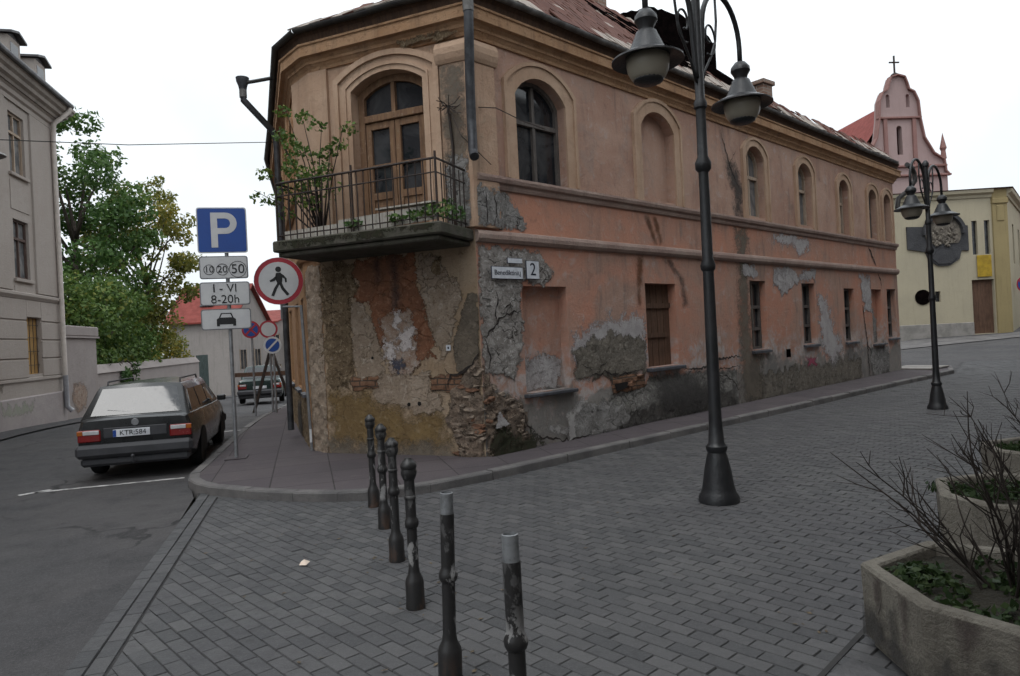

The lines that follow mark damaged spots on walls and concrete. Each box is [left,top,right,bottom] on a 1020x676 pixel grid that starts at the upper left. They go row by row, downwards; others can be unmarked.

peeling [444,154,527,232]
spalling [292,243,554,457]
crack [444,290,523,385]
spalling [568,329,647,439]